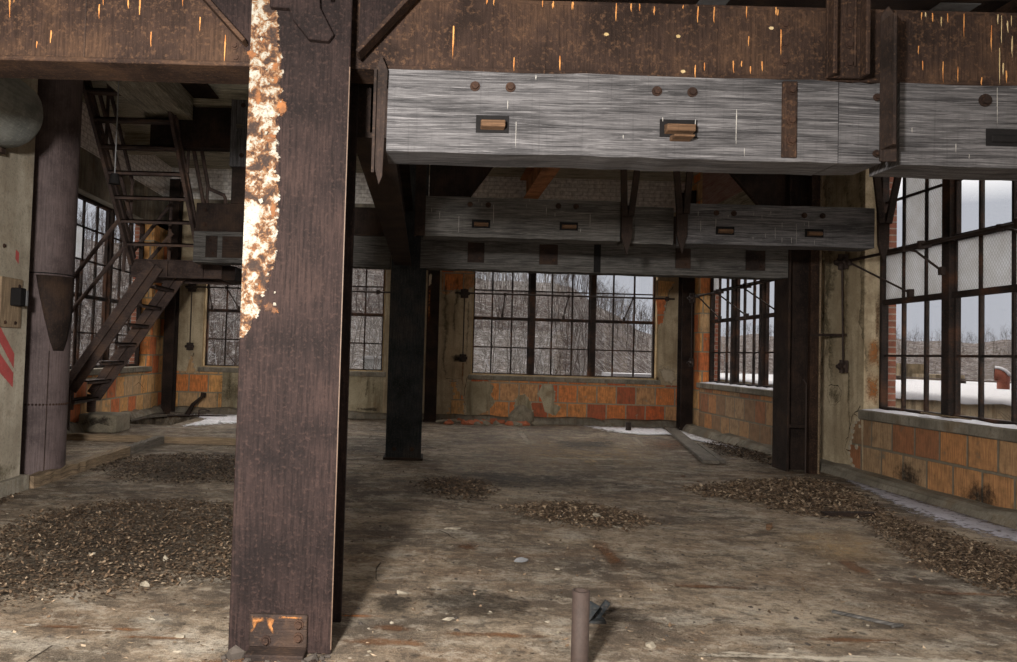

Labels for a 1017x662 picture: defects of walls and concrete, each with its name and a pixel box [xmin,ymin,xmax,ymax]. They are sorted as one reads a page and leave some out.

peeling [240,0,287,338]
rust [990,14,1013,83]